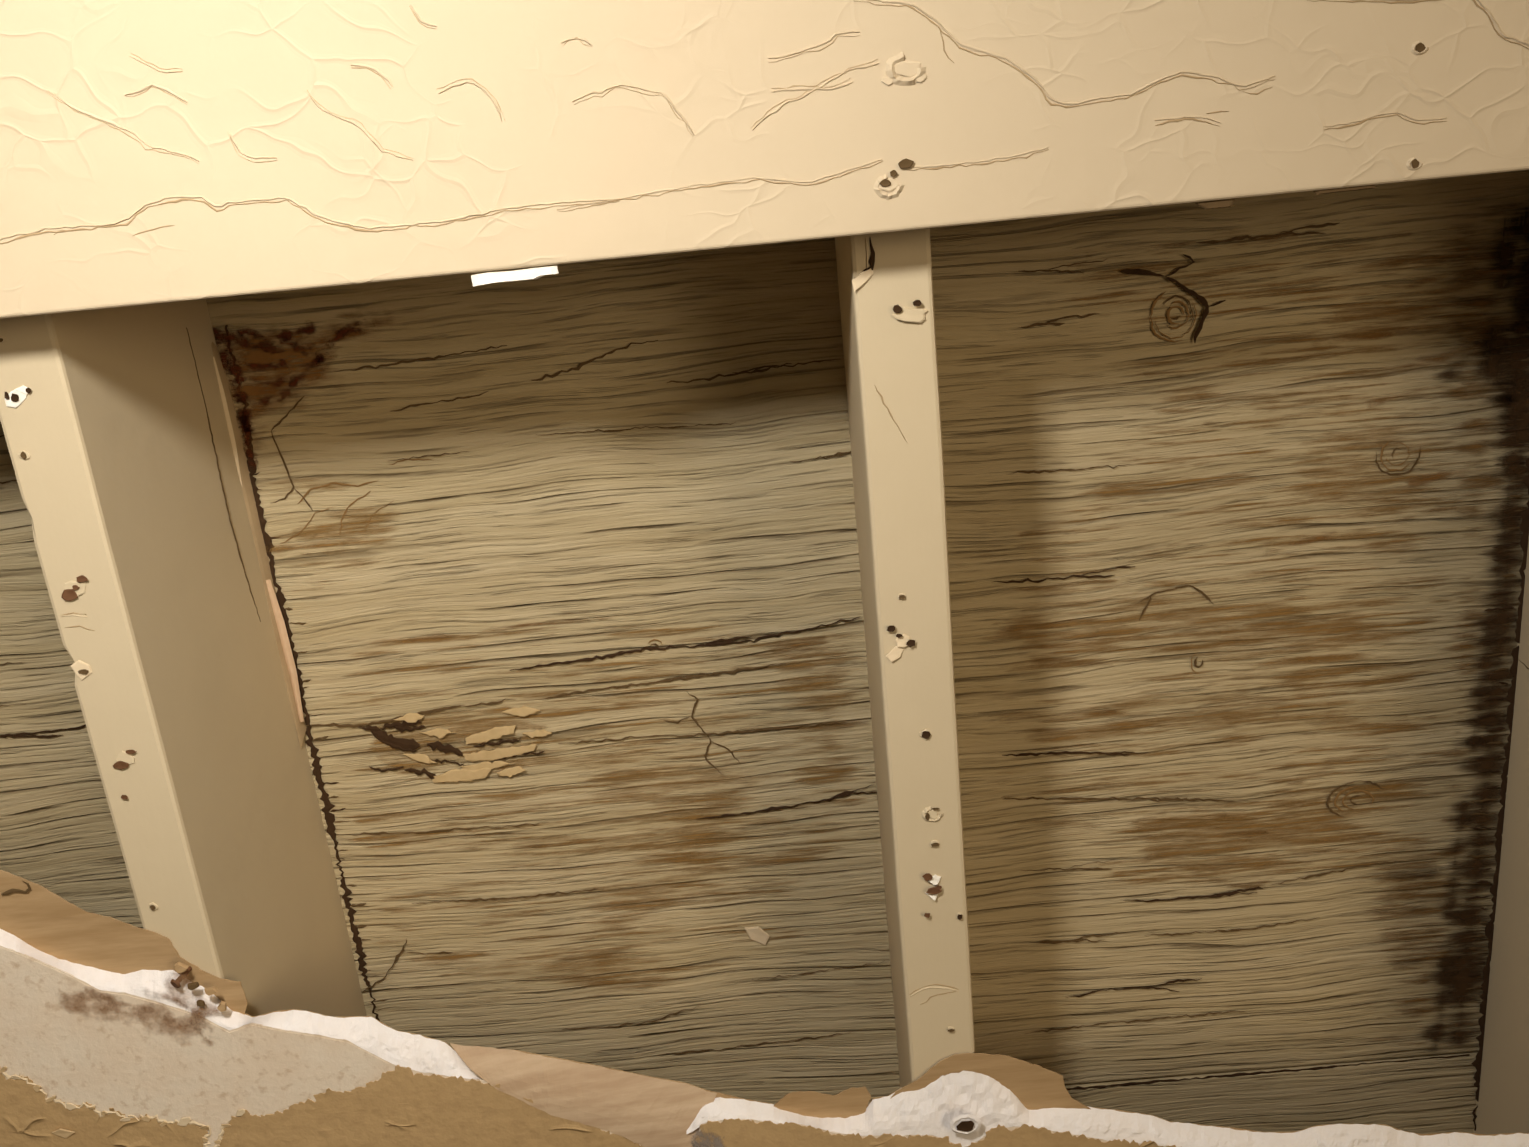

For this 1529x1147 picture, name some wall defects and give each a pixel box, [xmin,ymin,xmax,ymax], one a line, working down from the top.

crack [0,53,1049,244]
crack [753,0,1275,129]
crack [1323,111,1447,130]
crack [1307,0,1529,49]
spalling [471,266,559,287]
corrosion [213,315,384,466]
peeling [266,579,304,722]
spalling [358,706,551,783]
crack [186,325,884,1021]
damp [1004,206,1529,1050]
peeling [0,929,483,1147]
spalling [686,1070,1529,1147]